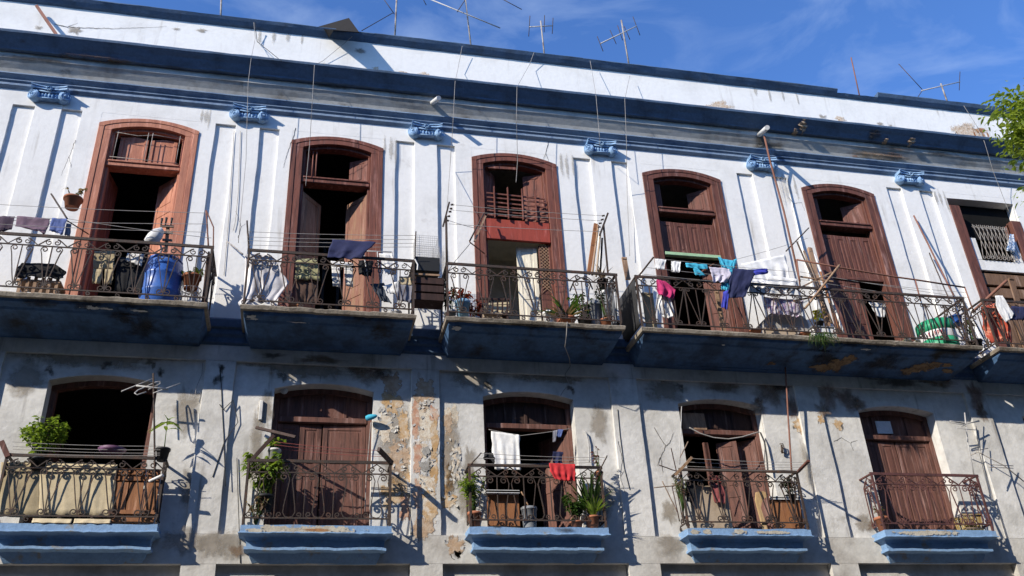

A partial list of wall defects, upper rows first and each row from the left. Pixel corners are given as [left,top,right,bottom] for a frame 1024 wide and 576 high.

peeling [372,372,462,543]